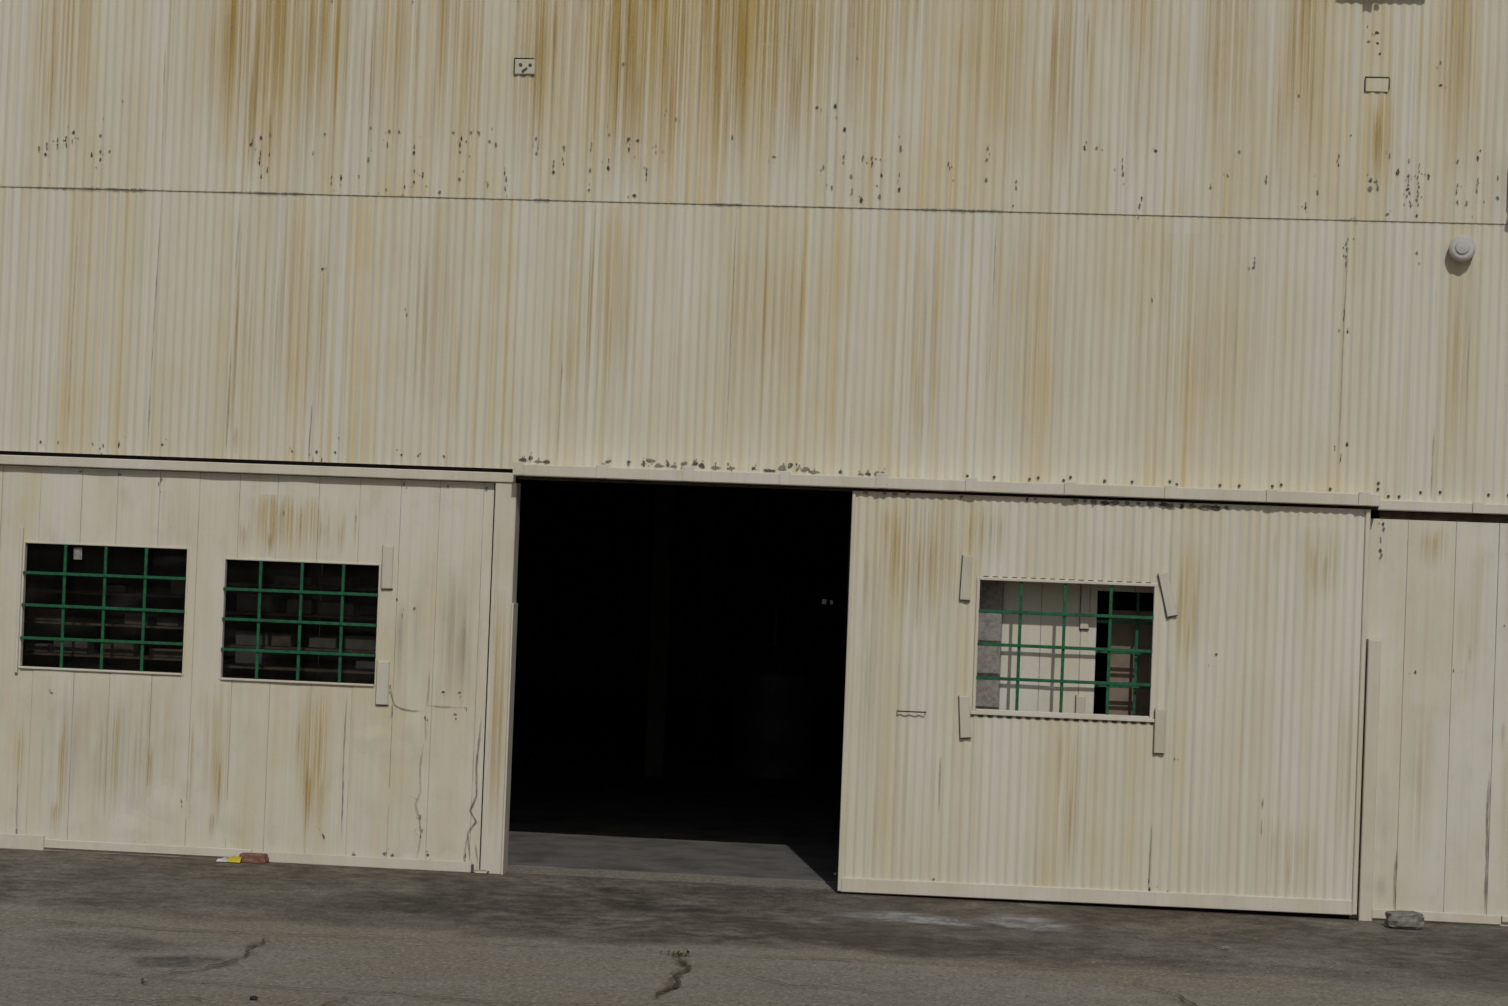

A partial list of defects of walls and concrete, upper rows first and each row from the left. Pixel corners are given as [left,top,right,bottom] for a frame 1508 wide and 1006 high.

corrosion [609,0,677,93]
corrosion [715,0,766,92]
crack [470,740,479,824]
crack [75,925,691,1006]